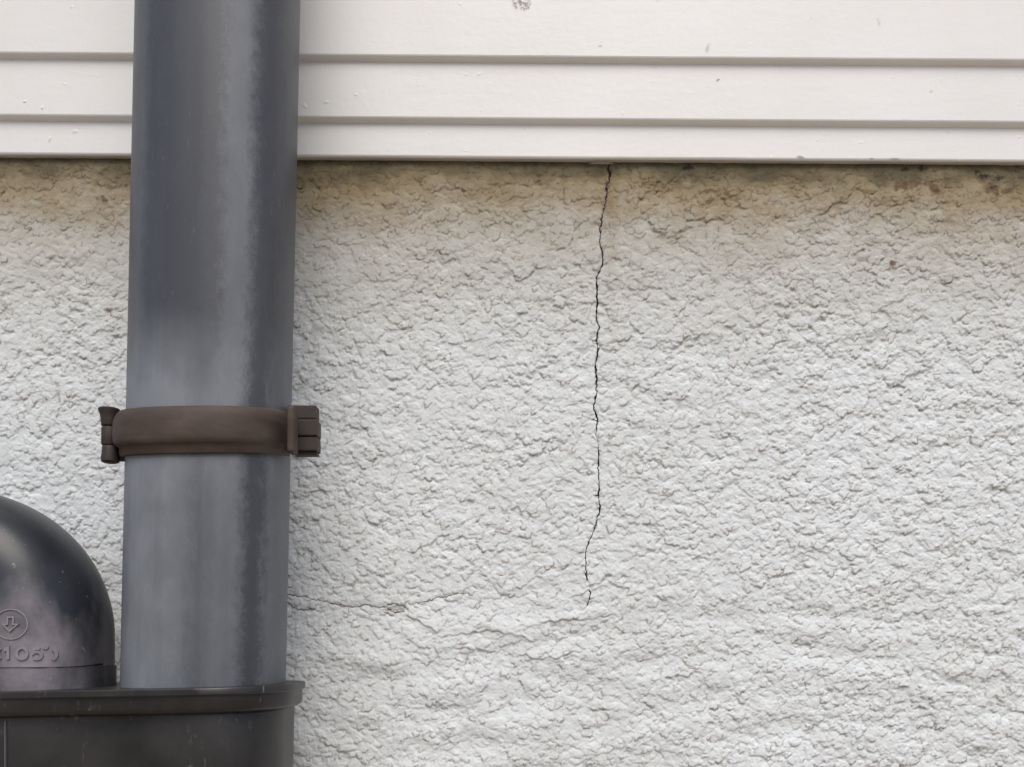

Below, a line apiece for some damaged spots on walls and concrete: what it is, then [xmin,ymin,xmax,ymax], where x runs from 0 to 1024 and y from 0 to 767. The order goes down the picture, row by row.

crack [585,164,611,608]
damp [296,160,1024,224]